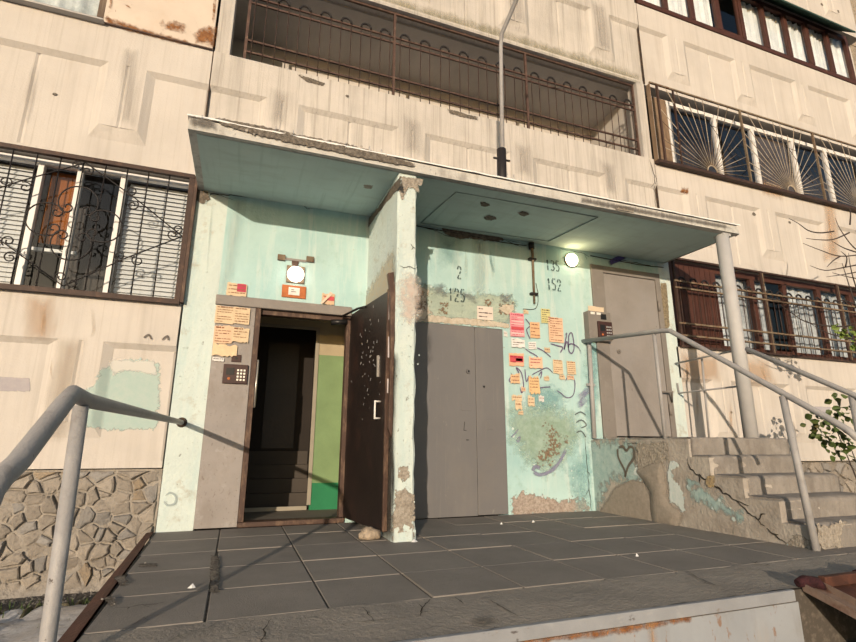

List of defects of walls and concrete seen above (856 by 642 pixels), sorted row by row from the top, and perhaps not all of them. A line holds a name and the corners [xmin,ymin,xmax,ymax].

rust [106,0,215,46]
spalling [215,118,415,166]
spalling [196,190,210,204]
spalling [368,176,423,227]
peeling [366,245,394,305]
peeling [401,275,517,365]
peeling [86,357,160,431]
spalling [391,466,416,540]
peeling [510,438,744,523]
crack [687,458,786,543]
rust [523,617,691,642]